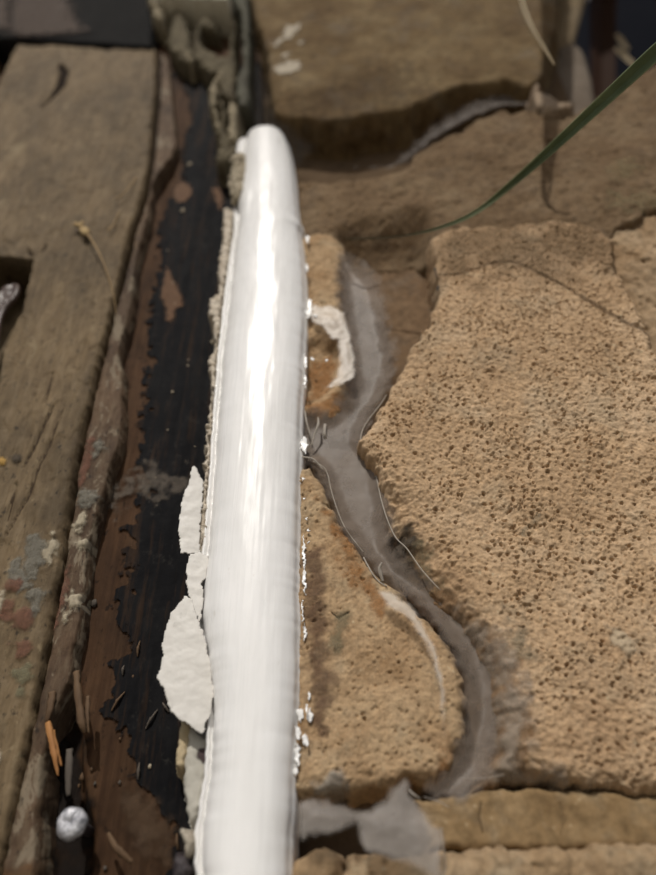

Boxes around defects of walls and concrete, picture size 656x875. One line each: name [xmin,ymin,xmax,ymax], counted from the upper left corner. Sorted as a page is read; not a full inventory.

peeling [99,70,234,875]
damp [301,548,333,736]
damp [387,523,419,576]